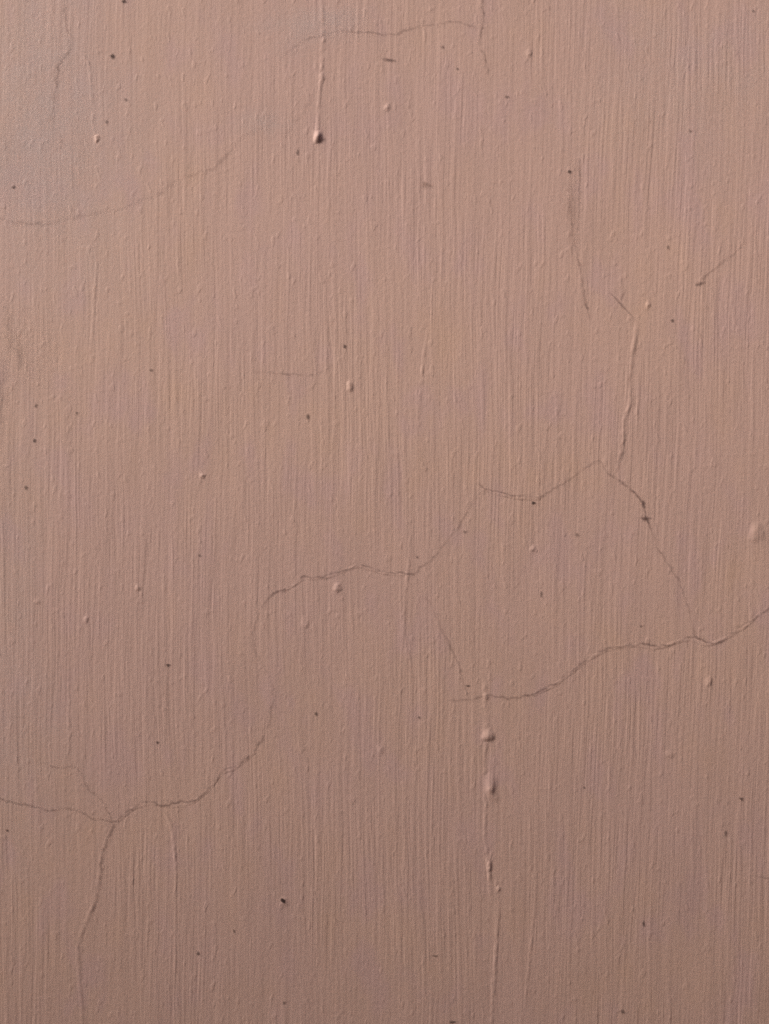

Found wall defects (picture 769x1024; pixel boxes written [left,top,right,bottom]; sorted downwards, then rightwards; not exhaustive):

crack [278,564,410,594]
crack [533,619,754,697]
crack [75,751,256,1024]